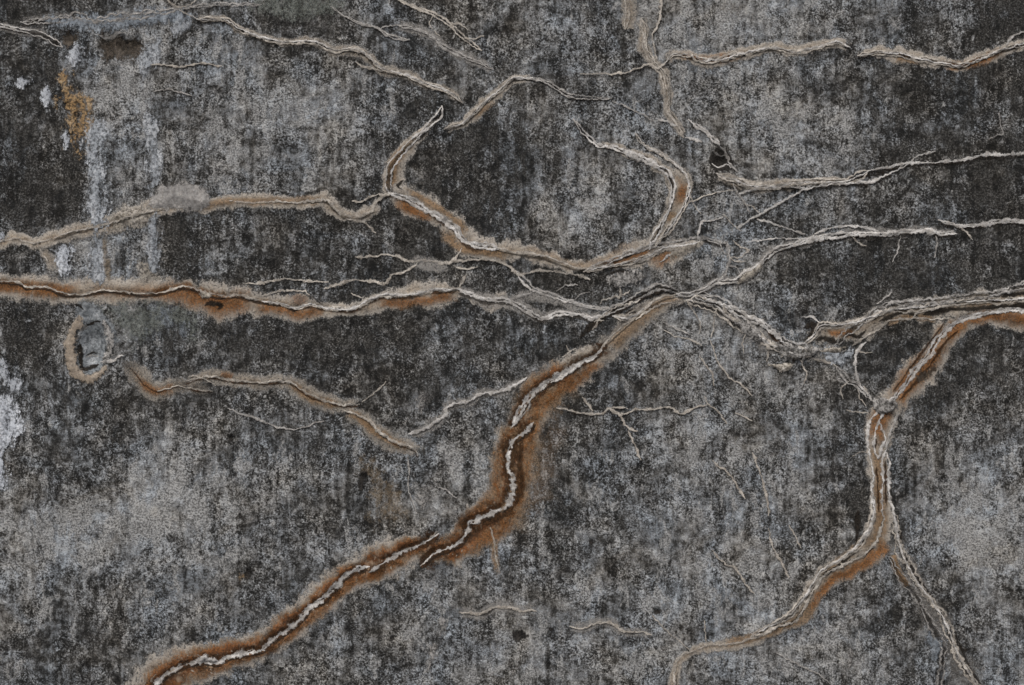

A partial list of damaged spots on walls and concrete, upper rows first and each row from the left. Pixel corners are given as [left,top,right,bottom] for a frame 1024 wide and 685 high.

corrosion [54,69,94,158]
crack [0,0,463,105]
crack [330,0,493,71]
crack [444,0,851,145]
crack [857,31,1024,73]
crack [0,198,186,271]
crack [195,105,1024,313]
crack [0,225,1024,685]